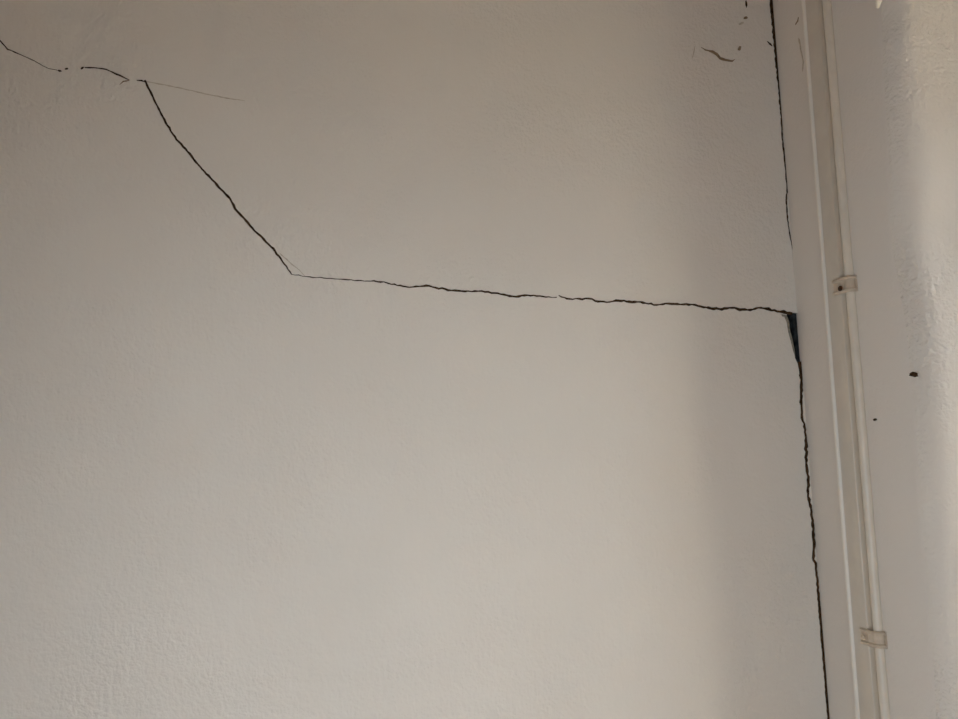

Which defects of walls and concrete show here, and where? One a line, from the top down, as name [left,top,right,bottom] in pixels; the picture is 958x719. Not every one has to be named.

crack [0,38,792,315]
crack [692,0,748,62]
crack [767,0,804,245]
crack [798,361,830,719]